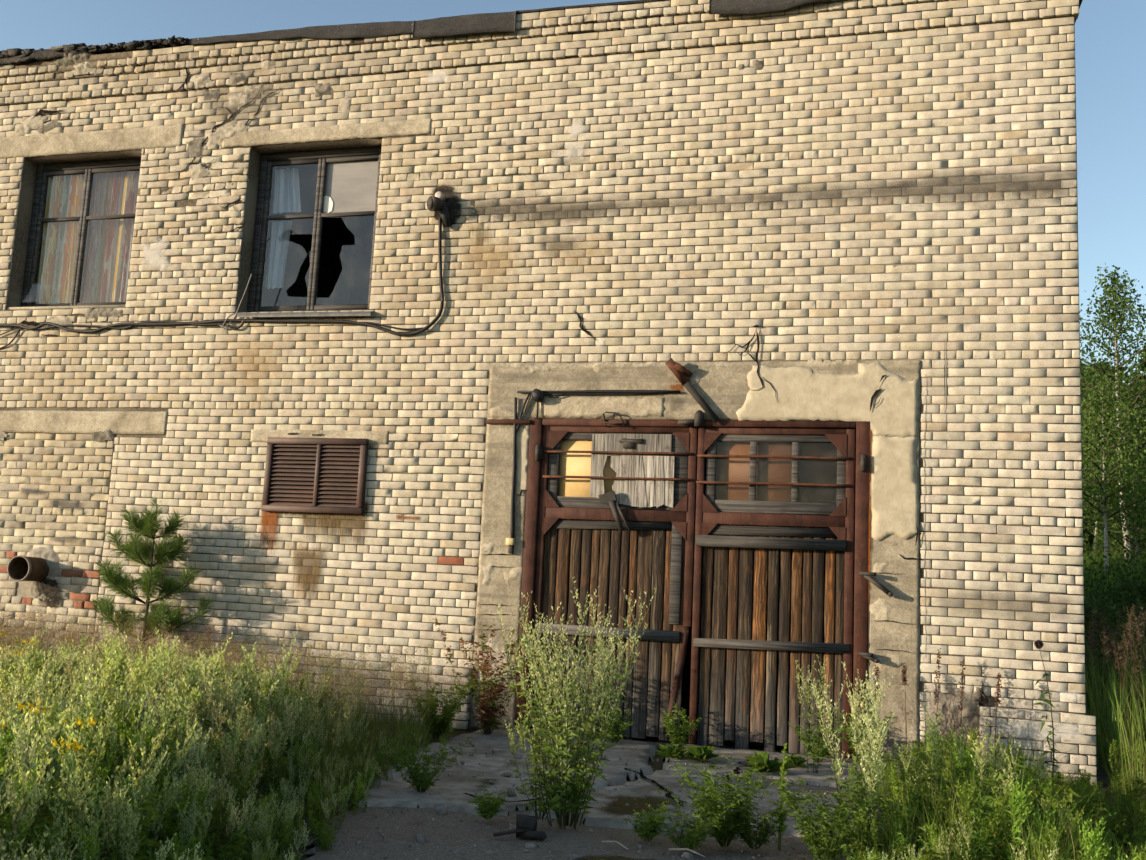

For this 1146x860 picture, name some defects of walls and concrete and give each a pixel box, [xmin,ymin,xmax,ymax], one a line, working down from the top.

crack [182,88,281,171]
crack [576,312,596,340]
crack [723,325,777,400]
flaking render [736,358,920,541]
corrosion [261,501,368,596]